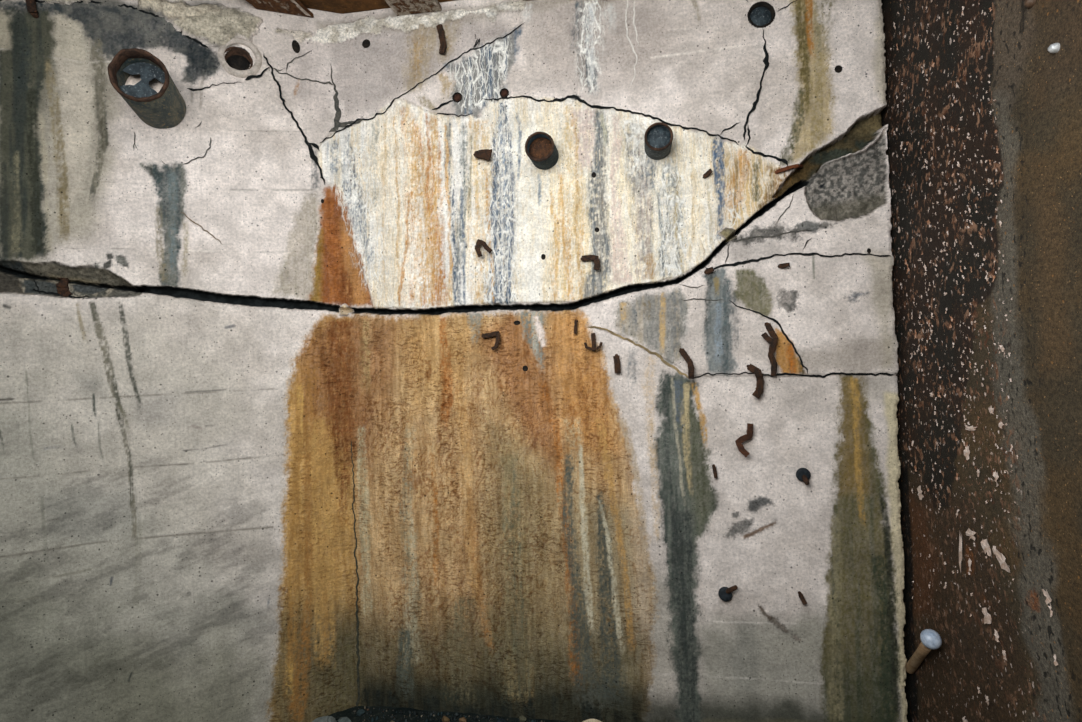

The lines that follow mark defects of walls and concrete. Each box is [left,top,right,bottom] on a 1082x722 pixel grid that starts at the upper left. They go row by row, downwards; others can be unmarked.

damp [0,0,227,287]
crack [0,0,894,378]
corrosion [263,182,663,722]
damp [270,0,842,722]
damp [816,371,905,722]